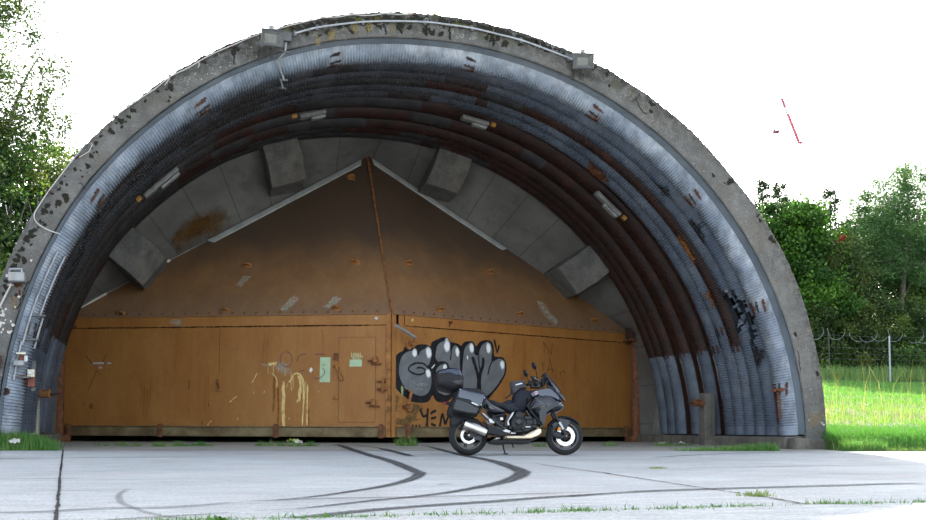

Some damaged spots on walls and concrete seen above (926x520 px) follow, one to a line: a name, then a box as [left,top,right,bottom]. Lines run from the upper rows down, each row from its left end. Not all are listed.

corrosion [772,382,788,425]